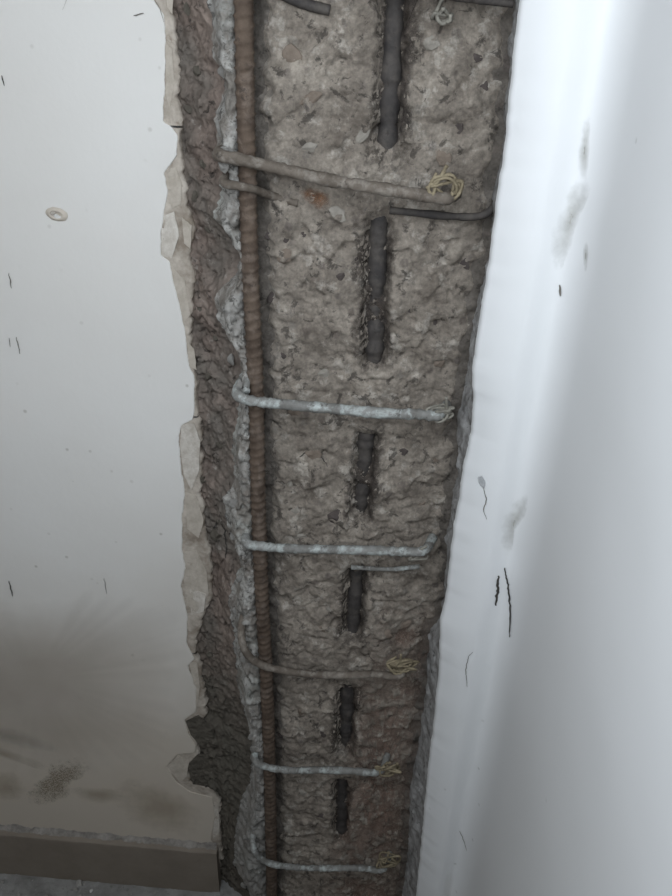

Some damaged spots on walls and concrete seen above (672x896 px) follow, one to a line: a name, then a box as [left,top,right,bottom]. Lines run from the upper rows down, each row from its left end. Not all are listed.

corrosion [397,0,420,149]
corrosion [352,223,394,368]
spalling [154,0,252,896]
corrosion [347,435,382,518]
spalling [259,0,520,896]
corrosion [337,570,371,644]